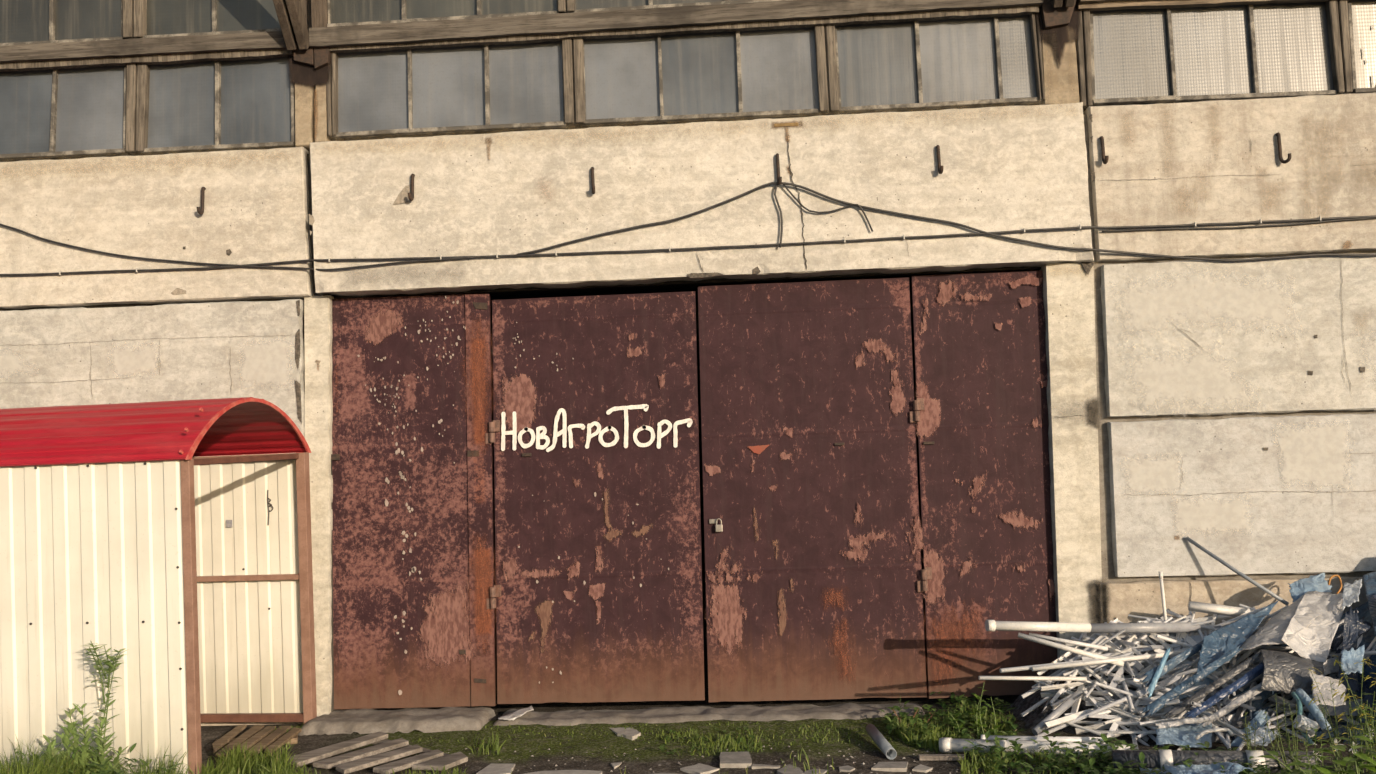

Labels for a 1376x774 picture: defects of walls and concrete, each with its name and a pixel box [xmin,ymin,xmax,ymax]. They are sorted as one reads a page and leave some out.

peeling [365,309,403,346]
peeling [627,333,645,358]
peeling [918,280,992,335]
peeling [1009,276,1043,308]
peeling [855,339,941,439]
peeling [955,471,988,513]
peeling [500,462,653,653]
peeling [753,507,780,560]
peeling [996,511,1043,531]
peeling [416,582,474,670]
peeling [706,547,762,656]
peeling [778,579,794,636]